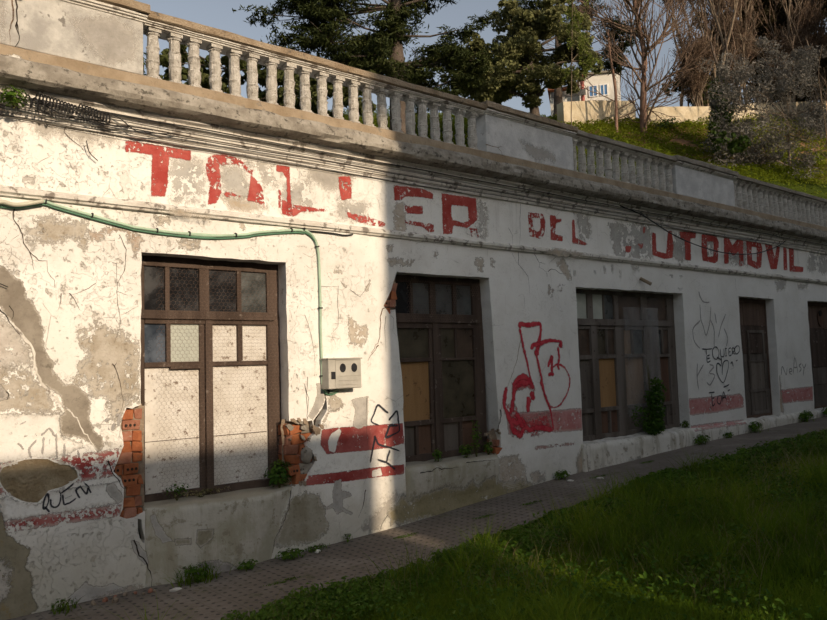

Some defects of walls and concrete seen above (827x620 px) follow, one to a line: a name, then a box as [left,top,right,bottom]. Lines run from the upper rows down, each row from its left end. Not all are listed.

crack [9,0,20,47]
crack [1,209,96,310]
crack [112,235,134,339]
peeling [0,265,145,620]
peeling [274,383,368,553]
crack [133,528,152,587]